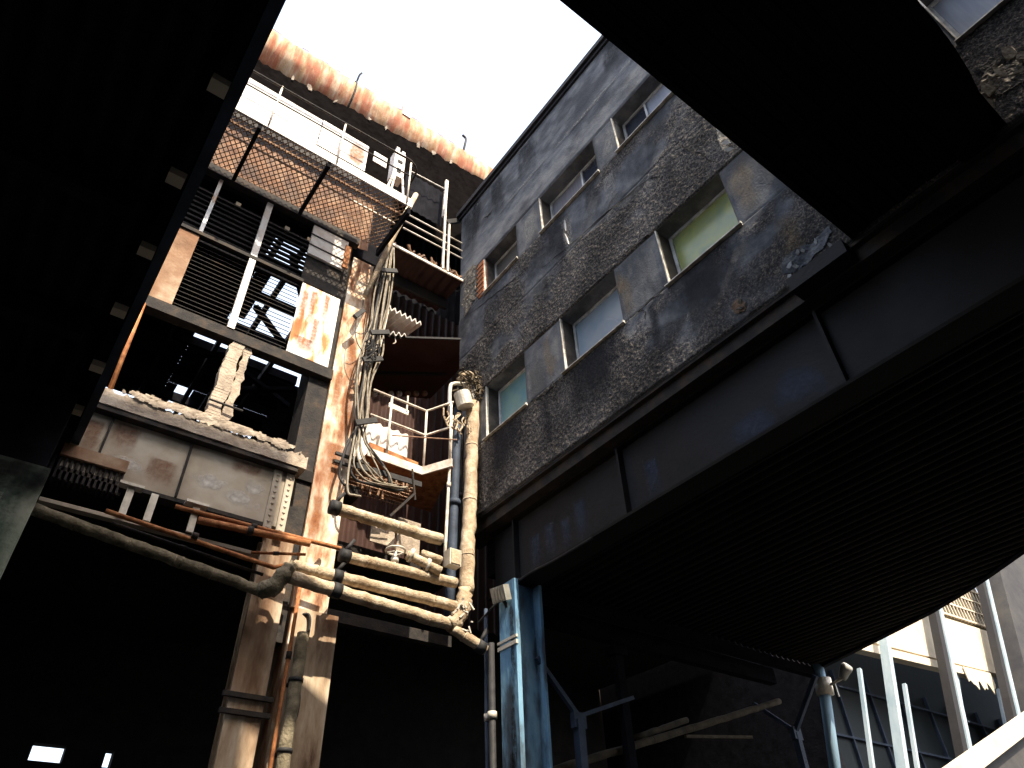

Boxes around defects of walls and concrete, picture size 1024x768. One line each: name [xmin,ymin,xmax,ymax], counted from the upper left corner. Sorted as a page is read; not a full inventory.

rust [350,145,364,165]
spalling [781,226,832,278]
rust [298,291,330,348]
rust [334,340,356,428]
spalling [122,389,301,454]
rust [326,444,343,476]
rust [309,497,320,536]